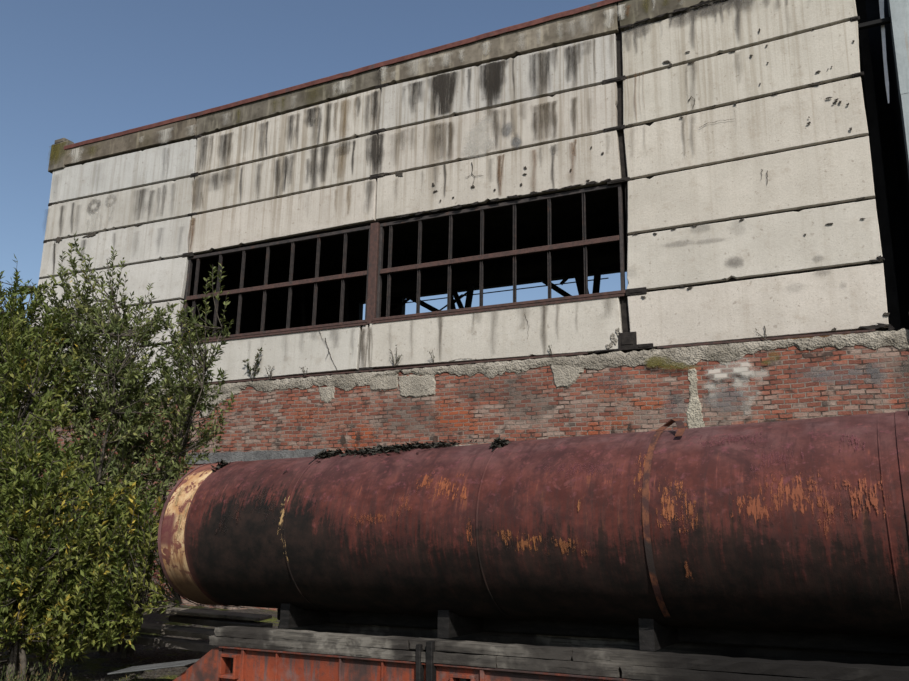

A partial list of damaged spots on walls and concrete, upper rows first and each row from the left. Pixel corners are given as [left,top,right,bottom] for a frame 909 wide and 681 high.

leakage [533,51,550,87]
leakage [566,45,577,74]
leakage [358,91,378,121]
leakage [412,72,456,154]
leakage [481,59,514,121]
leakage [534,102,556,131]
leakage [51,142,79,162]
leakage [275,156,292,187]
leakage [289,104,331,184]
leakage [367,134,383,199]